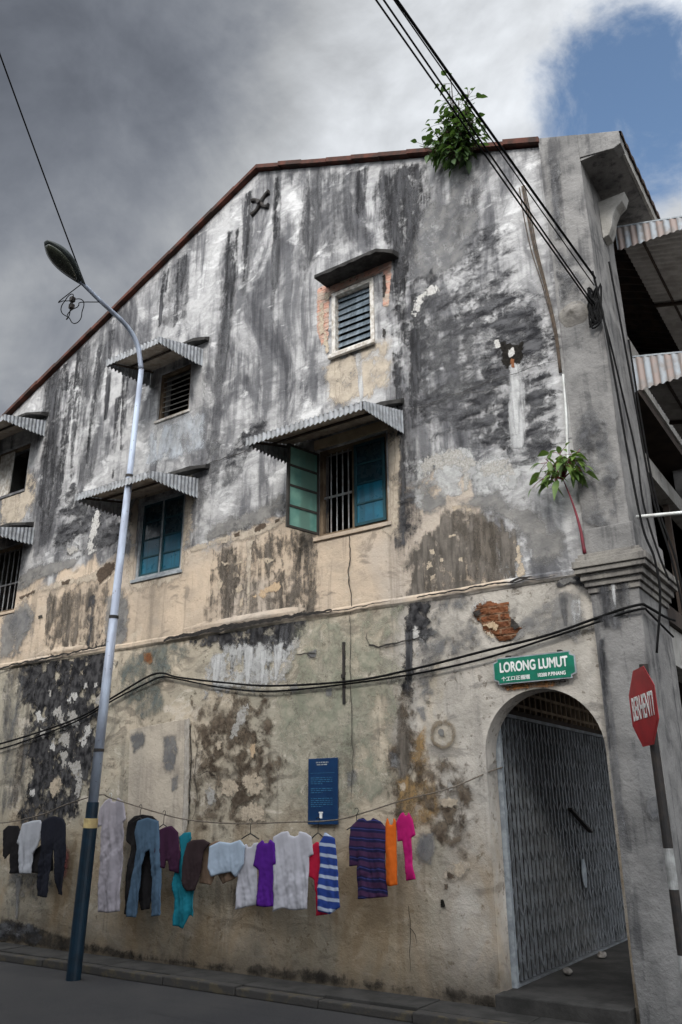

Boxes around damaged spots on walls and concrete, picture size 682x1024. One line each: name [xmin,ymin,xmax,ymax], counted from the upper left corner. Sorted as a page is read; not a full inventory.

water stain [158,254,188,327]
water stain [216,191,253,385]
water stain [271,177,281,309]
flaking render [317,261,392,353]
spalling [494,339,524,368]
water stain [37,330,129,558]
peeling [190,516,286,552]
water stain [298,157,618,864]
water stain [0,530,318,841]
flaking render [471,597,523,642]